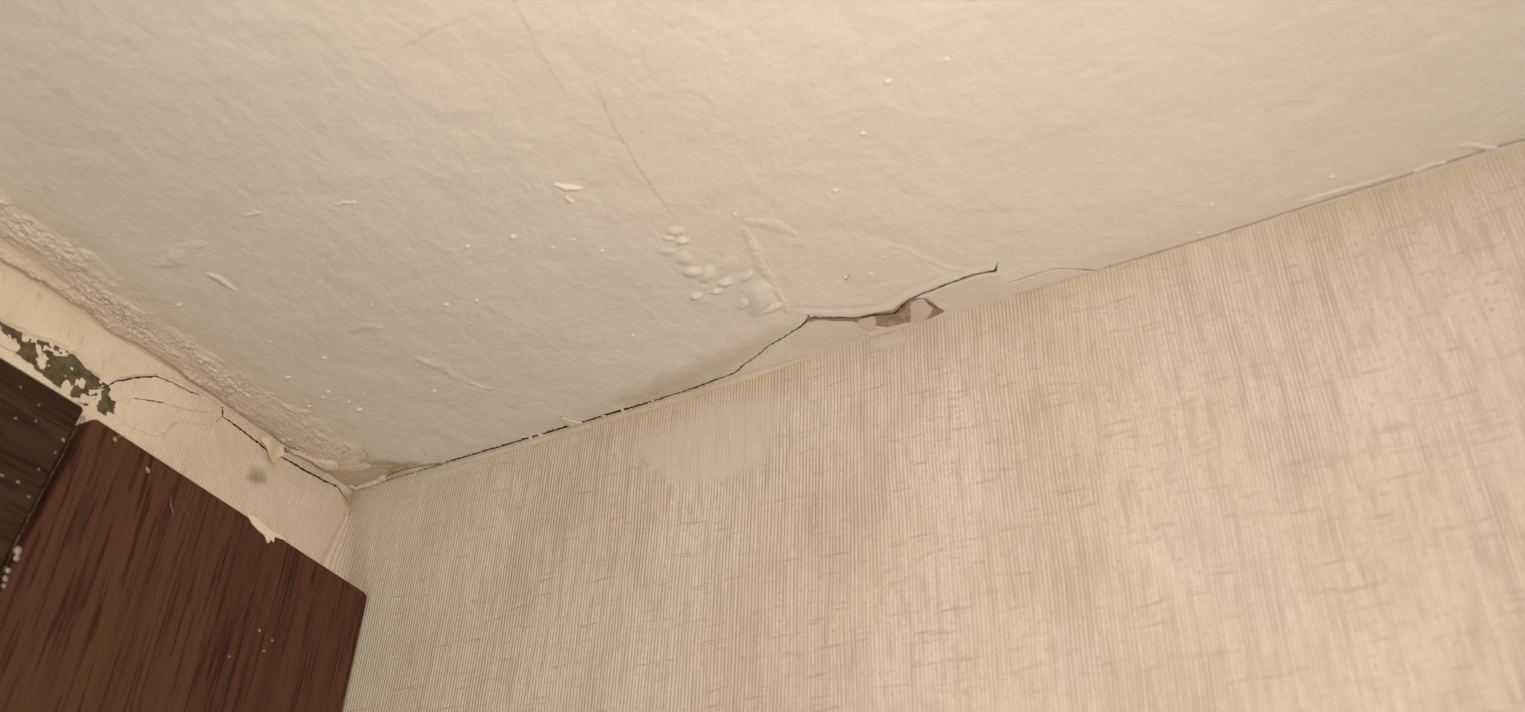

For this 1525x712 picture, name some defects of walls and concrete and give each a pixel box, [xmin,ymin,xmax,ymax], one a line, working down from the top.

crack [0,326,20,352]
crack [90,315,809,501]
flaking render [0,190,1000,491]